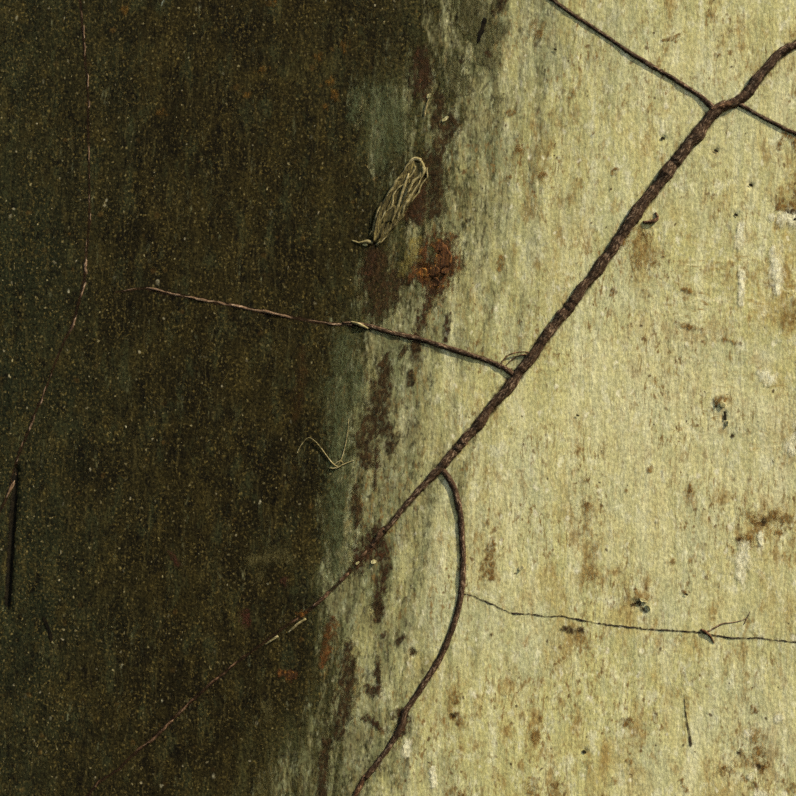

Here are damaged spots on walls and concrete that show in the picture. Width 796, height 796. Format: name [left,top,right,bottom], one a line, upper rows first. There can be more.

crack [115,287,342,326]
damp [0,0,510,796]
rust [408,228,466,353]
crack [346,0,796,796]
crack [86,573,349,796]